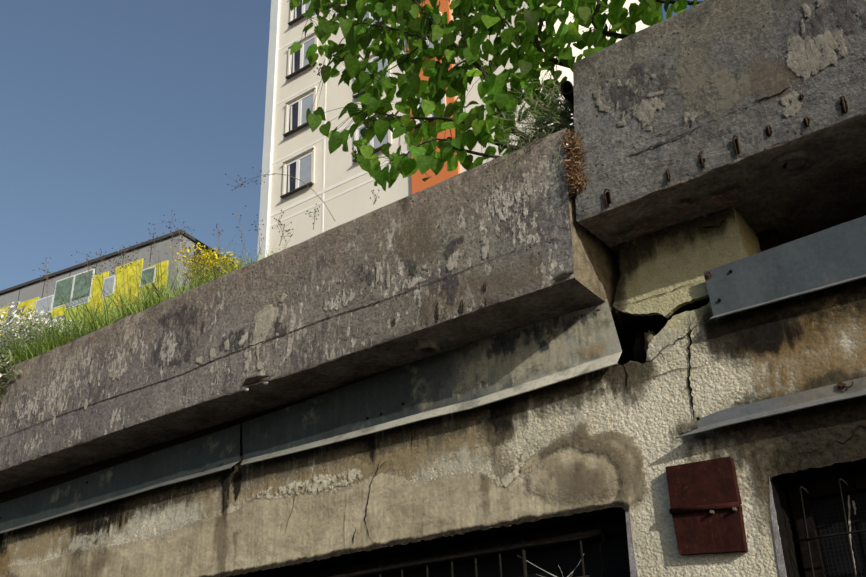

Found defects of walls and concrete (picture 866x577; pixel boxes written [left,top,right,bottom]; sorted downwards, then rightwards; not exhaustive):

peeling [784,0,849,81]
peeling [593,79,665,130]
peeling [479,181,535,260]
peeling [15,344,135,426]
peeling [195,292,293,392]
water stain [453,311,600,395]
crack [623,314,711,419]
rust [754,310,866,397]
water stain [0,415,504,577]
crack [344,459,389,546]
water stain [489,451,527,488]
water stain [532,416,642,501]